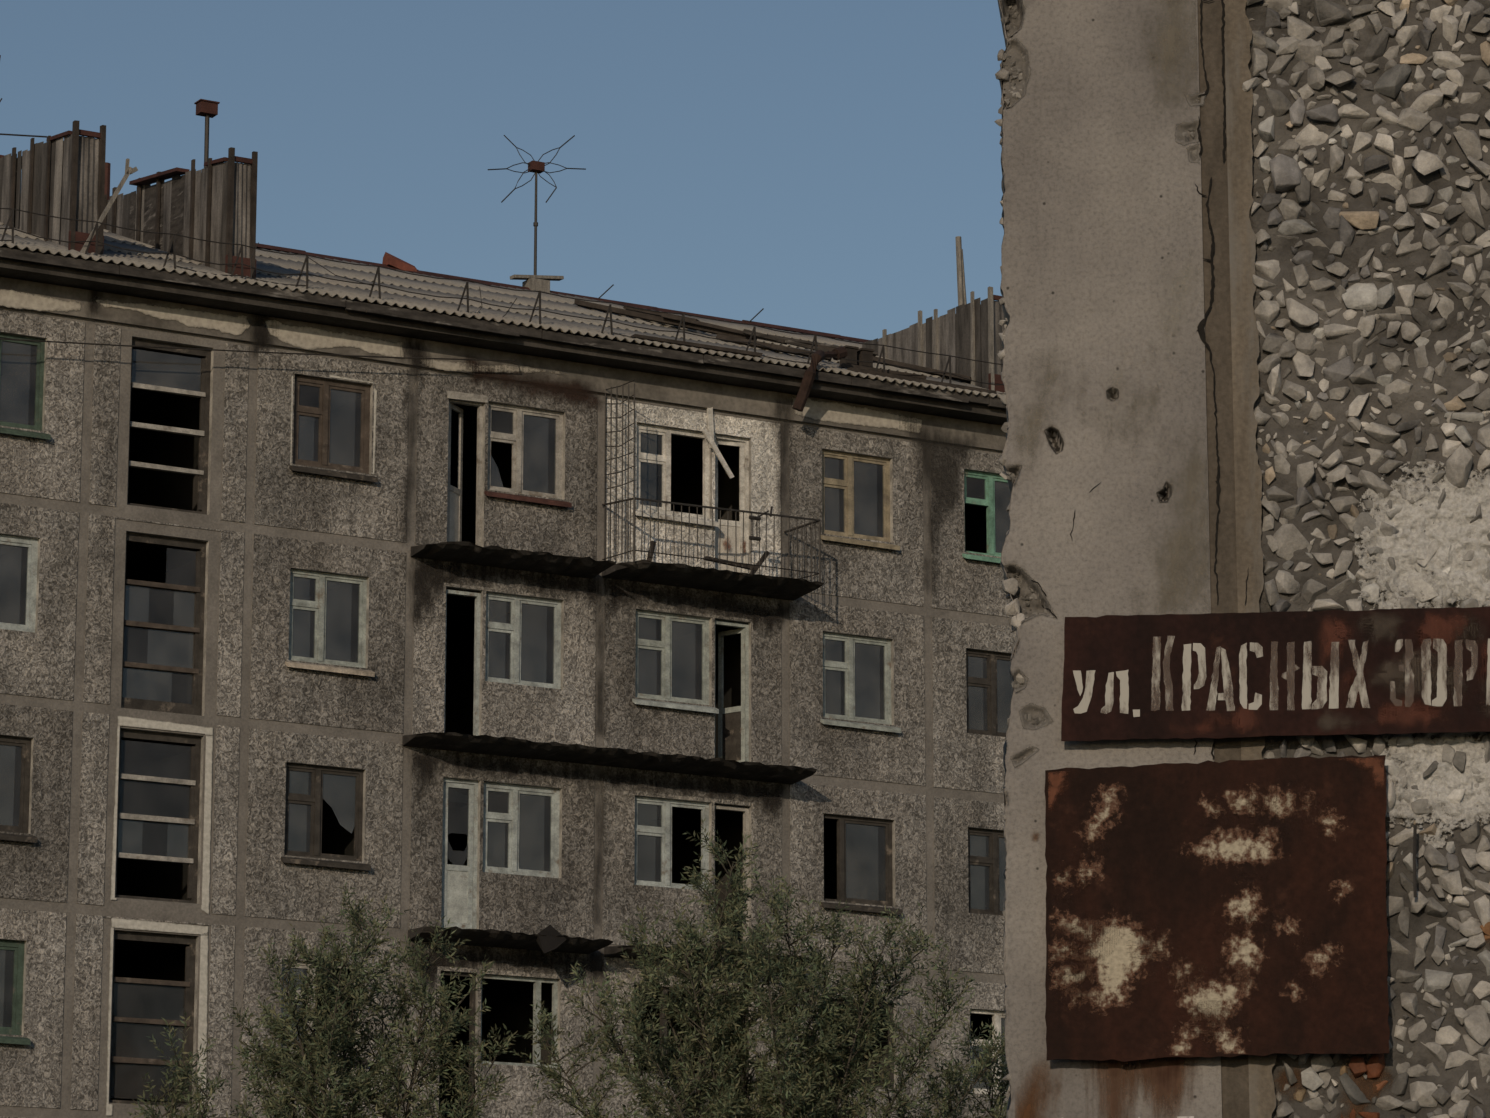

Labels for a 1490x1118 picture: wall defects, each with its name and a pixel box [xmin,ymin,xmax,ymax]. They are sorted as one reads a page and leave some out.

spalling [1000,0,1031,108]
crack [1195,0,1249,605]
spalling [1005,564,1055,623]
corrosion [1346,757,1384,787]
corrosion [1016,1070,1049,1118]